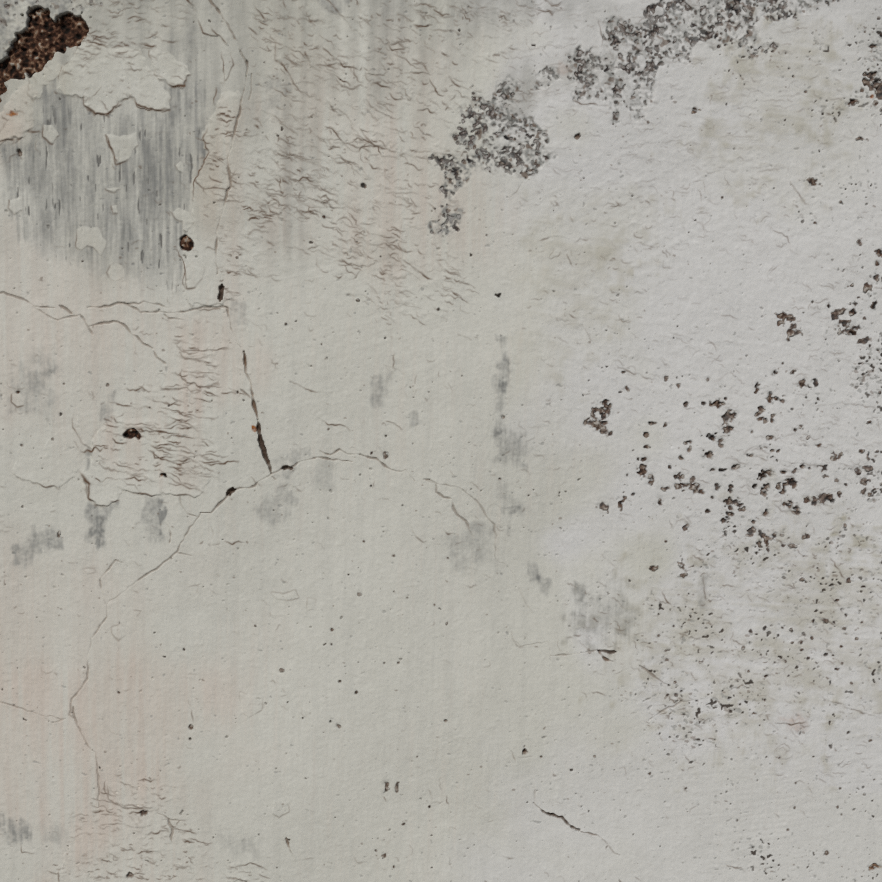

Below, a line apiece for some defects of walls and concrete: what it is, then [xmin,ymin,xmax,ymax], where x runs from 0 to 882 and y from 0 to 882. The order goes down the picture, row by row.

flaking render [533,0,842,128]
flaking render [848,61,882,134]
peeling [0,0,560,308]
flaking render [827,249,882,345]
crack [0,0,534,808]
flaking render [583,400,613,438]
flaking render [751,382,786,434]
flaking render [596,493,635,516]
flaking render [627,398,810,553]
flaking render [752,451,848,516]
flaking render [854,449,882,497]
crack [533,789,622,857]